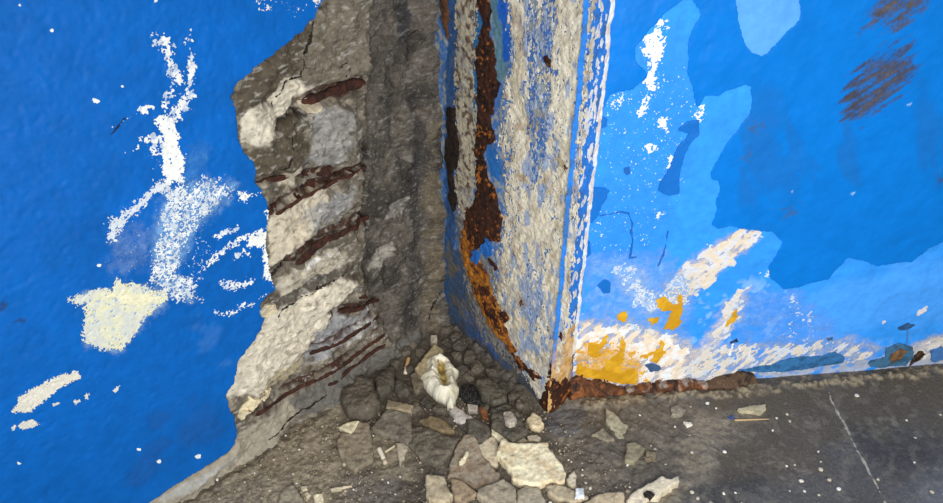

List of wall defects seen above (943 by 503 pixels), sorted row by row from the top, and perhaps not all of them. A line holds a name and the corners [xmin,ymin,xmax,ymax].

rust [439,0,450,39]
rust [868,0,929,31]
rust [842,45,915,121]
spalling [67,0,478,503]
rust [444,0,757,413]
peeling [460,0,943,400]
peeling [11,370,81,431]
crack [829,392,887,503]